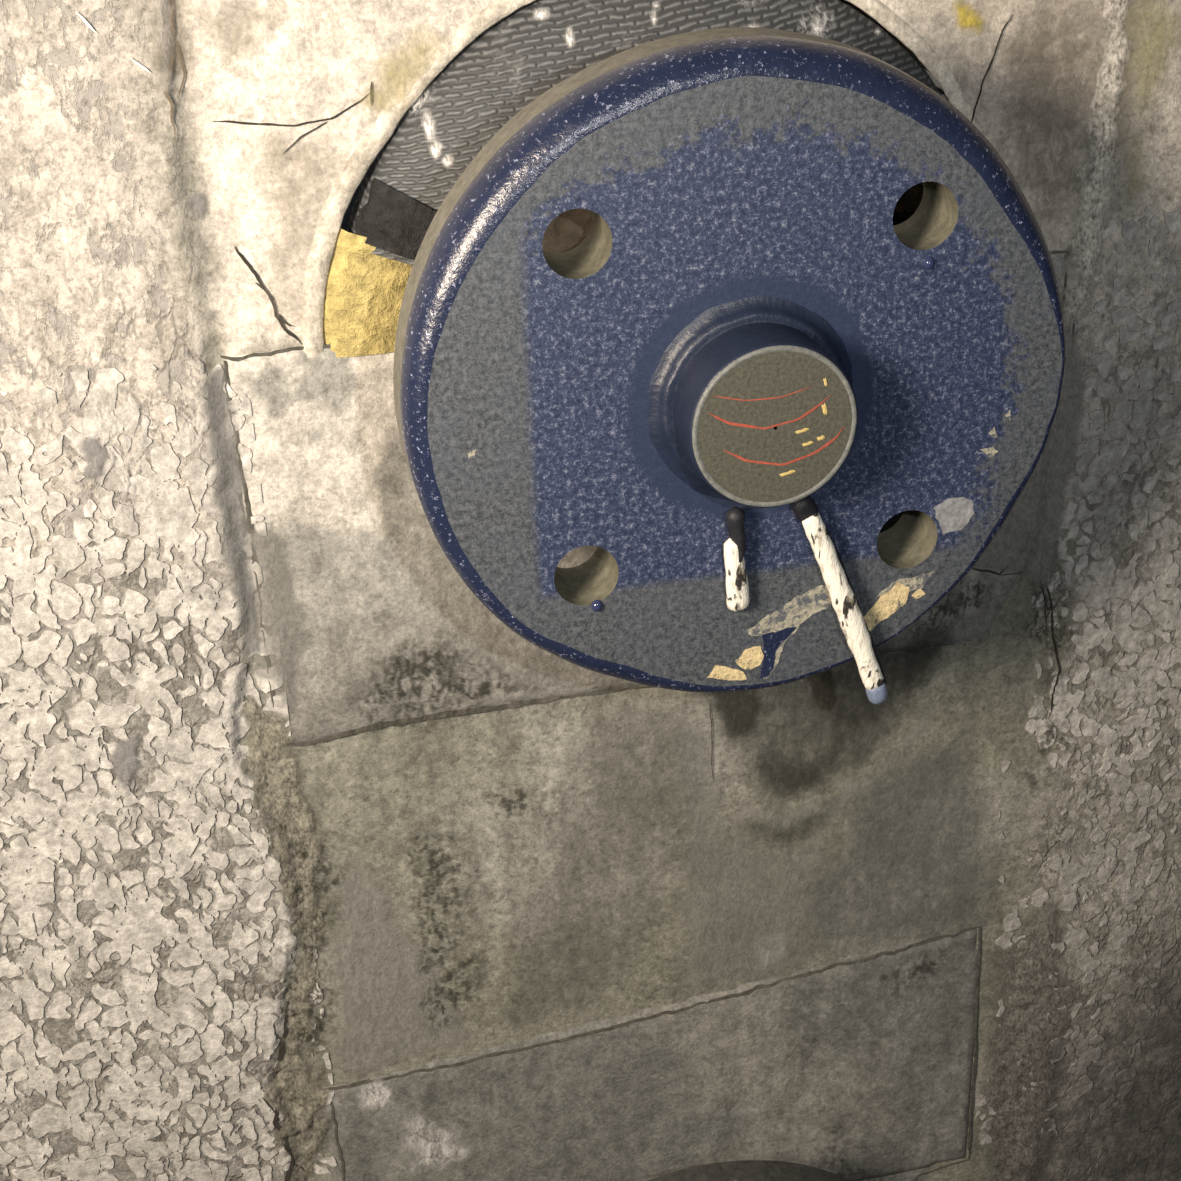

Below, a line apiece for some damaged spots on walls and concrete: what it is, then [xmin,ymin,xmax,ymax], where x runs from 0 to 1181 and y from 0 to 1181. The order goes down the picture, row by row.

crack [971,14,1013,123]
crack [212,81,373,156]
crack [234,246,302,345]
peeling [708,585,832,681]
peeling [864,570,936,631]
crack [960,567,1061,719]
leakage [716,669,880,789]